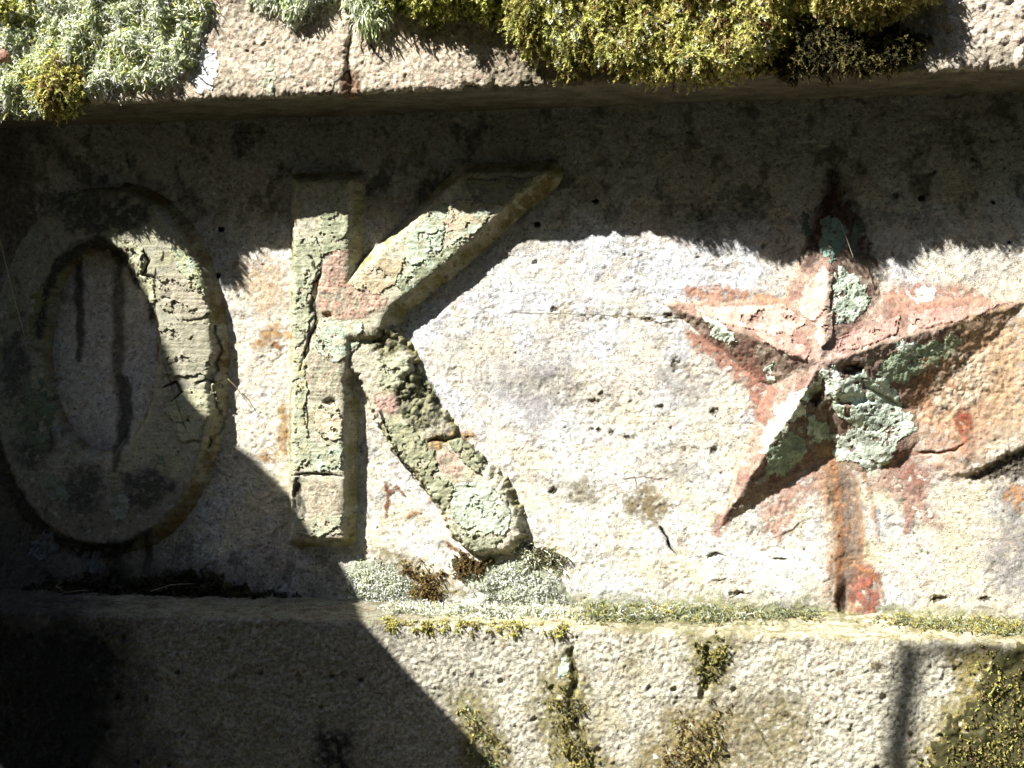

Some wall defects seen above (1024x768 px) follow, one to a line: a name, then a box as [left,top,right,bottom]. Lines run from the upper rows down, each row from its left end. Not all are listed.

crack [142,248,164,300]
spalling [599,313,673,322]
peeling [695,266,1010,360]
leakage [0,192,175,514]
crack [163,378,221,401]
peeling [289,176,536,553]
spalling [927,349,997,412]
spalling [963,436,1024,483]
rust [821,448,882,615]